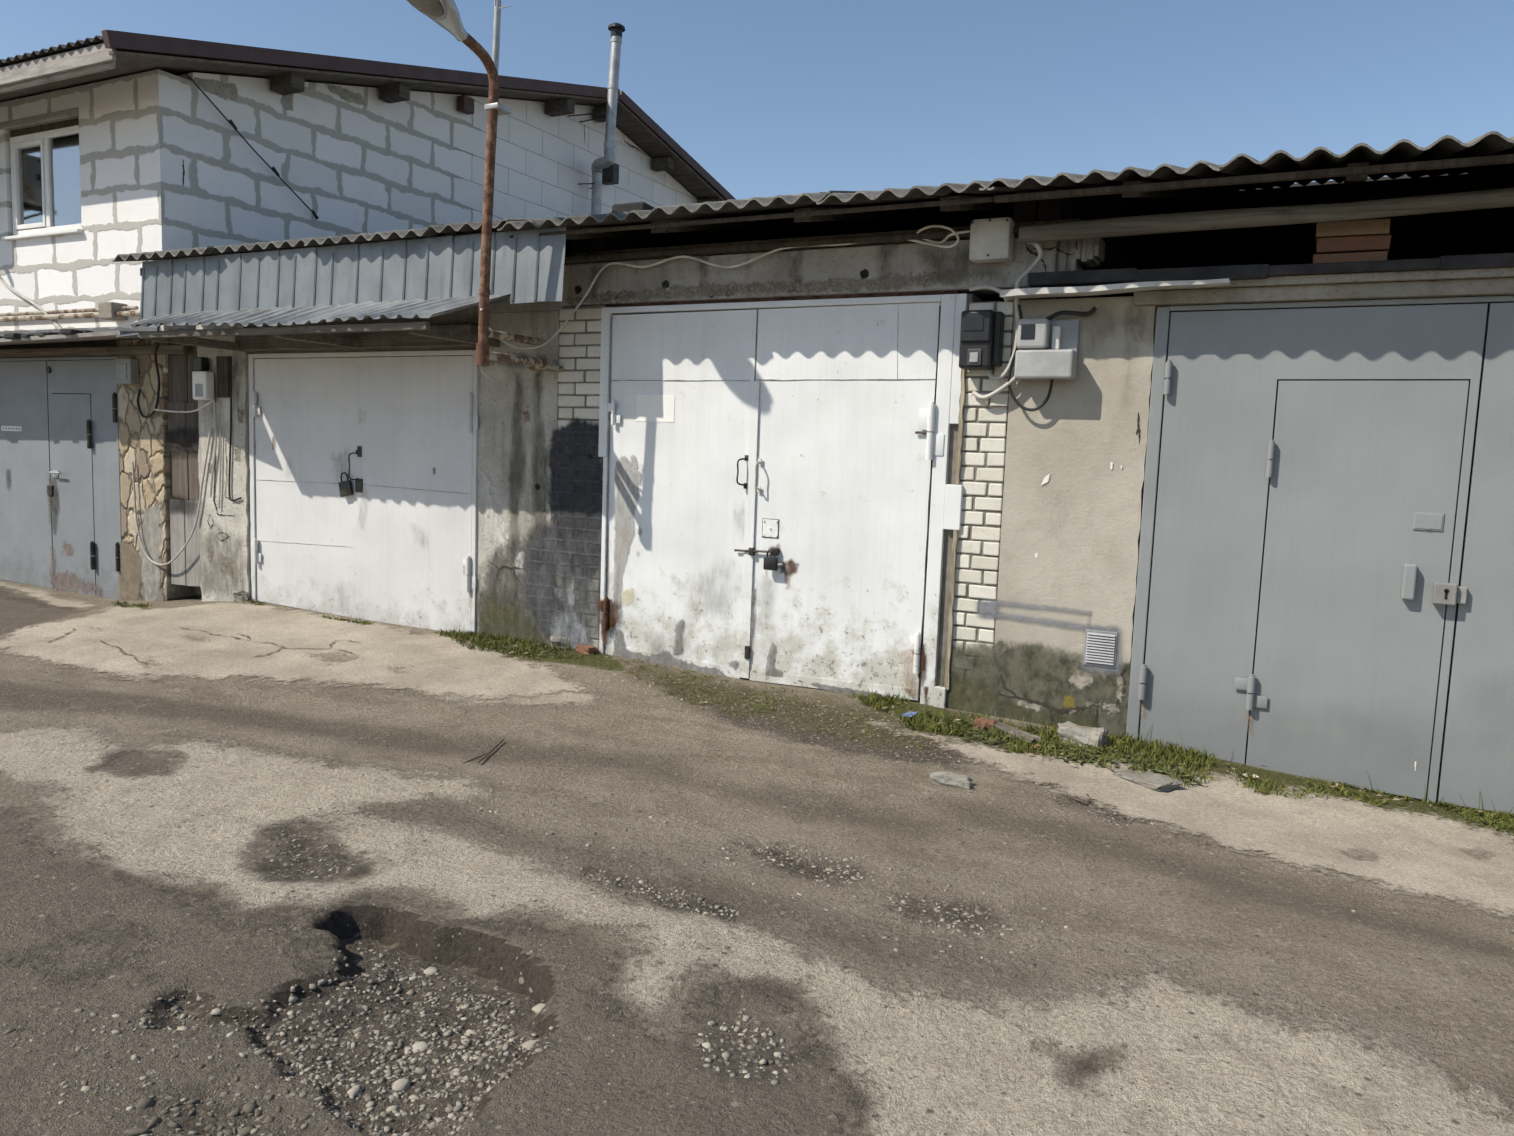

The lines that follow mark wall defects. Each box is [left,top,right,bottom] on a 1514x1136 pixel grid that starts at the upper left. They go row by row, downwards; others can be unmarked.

damp [479,357,551,573]
peeling [613,455,642,608]
corrosion [769,547,798,576]
corrosion [597,600,618,647]
peeling [613,586,883,698]